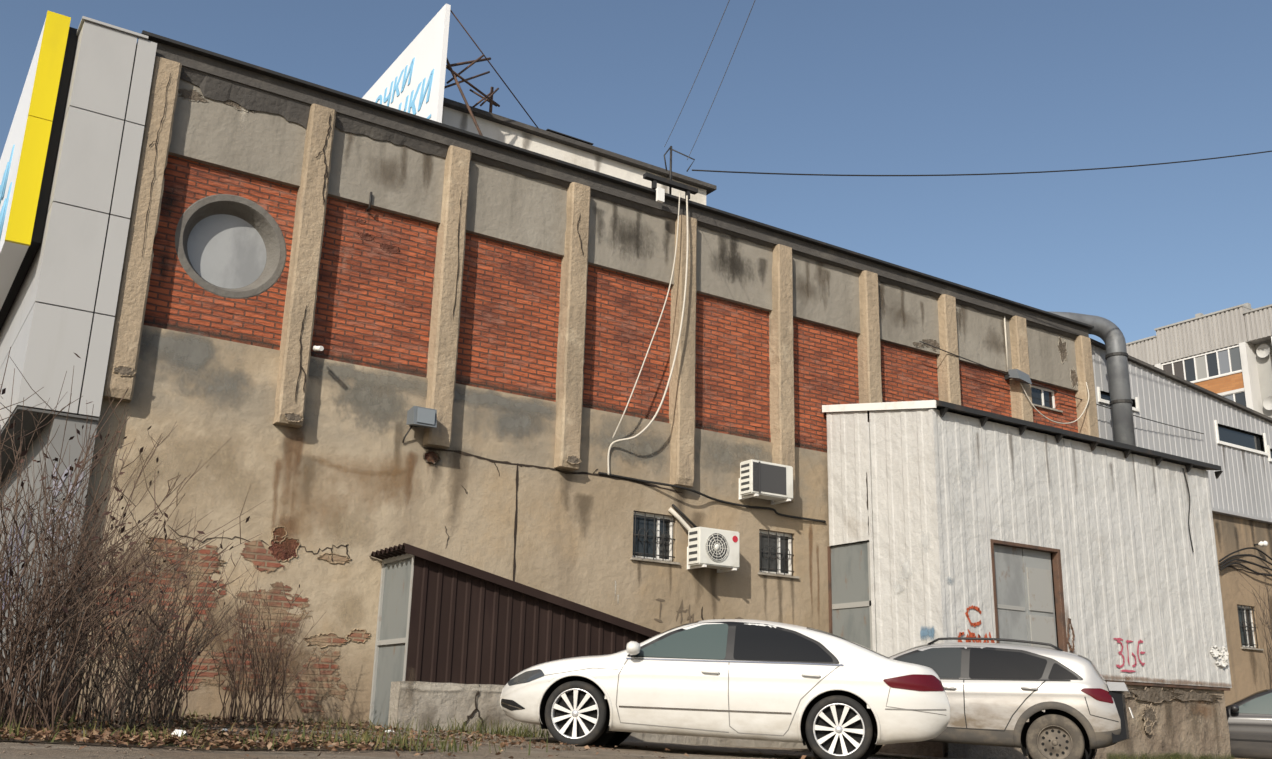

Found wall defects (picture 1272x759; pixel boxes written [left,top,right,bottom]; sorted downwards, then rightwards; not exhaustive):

crack [142,73,171,256]
crack [316,113,331,205]
crack [295,305,307,401]
spalling [86,526,370,720]